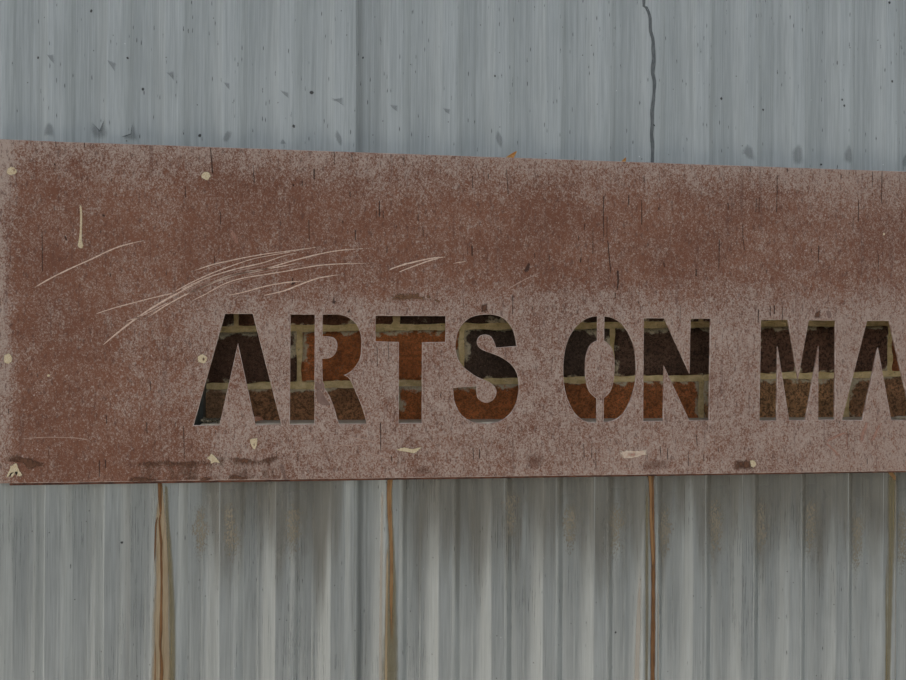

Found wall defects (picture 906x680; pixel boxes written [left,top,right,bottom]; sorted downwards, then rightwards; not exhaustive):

crack [642,0,656,163]
corrosion [152,483,175,680]
corrosion [384,480,396,680]
corrosion [646,476,655,680]